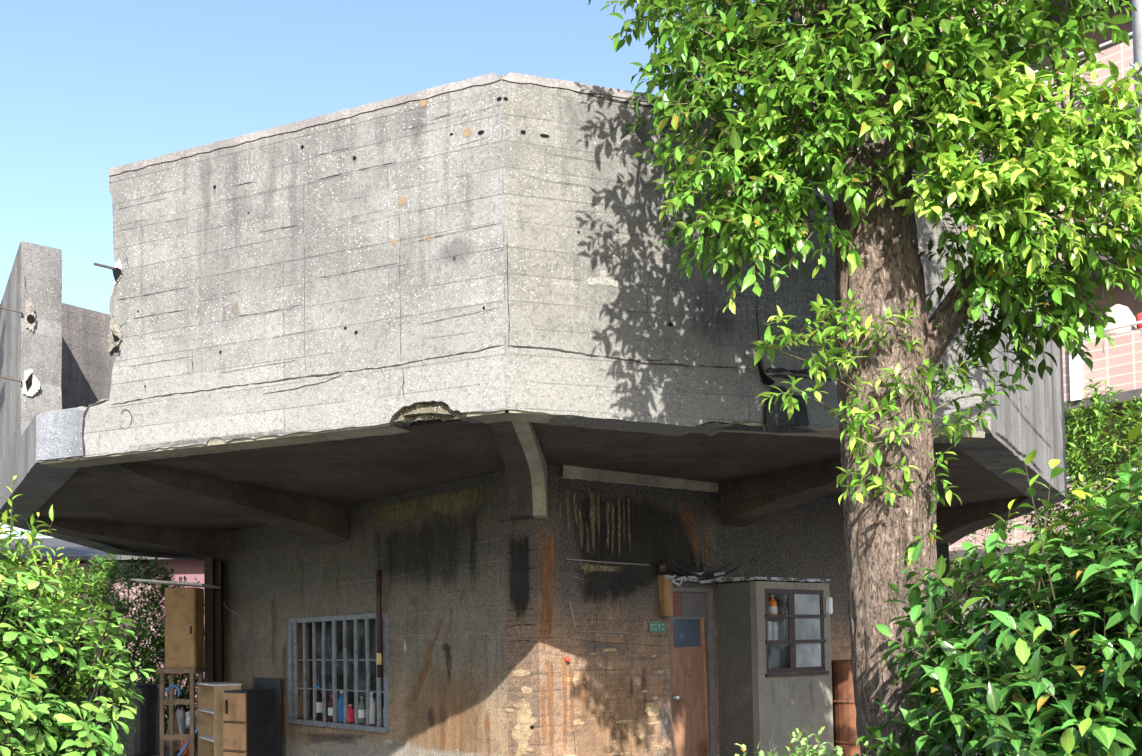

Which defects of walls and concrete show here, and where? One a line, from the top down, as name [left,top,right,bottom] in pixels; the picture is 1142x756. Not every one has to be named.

spalling [94,257,128,294]
spalling [0,298,36,332]
crack [82,147,837,457]
spalling [108,317,128,356]
spalling [0,369,40,396]
spalling [394,402,467,423]
water stain [559,491,630,573]
peeling [506,669,537,756]
rust [542,661,646,755]